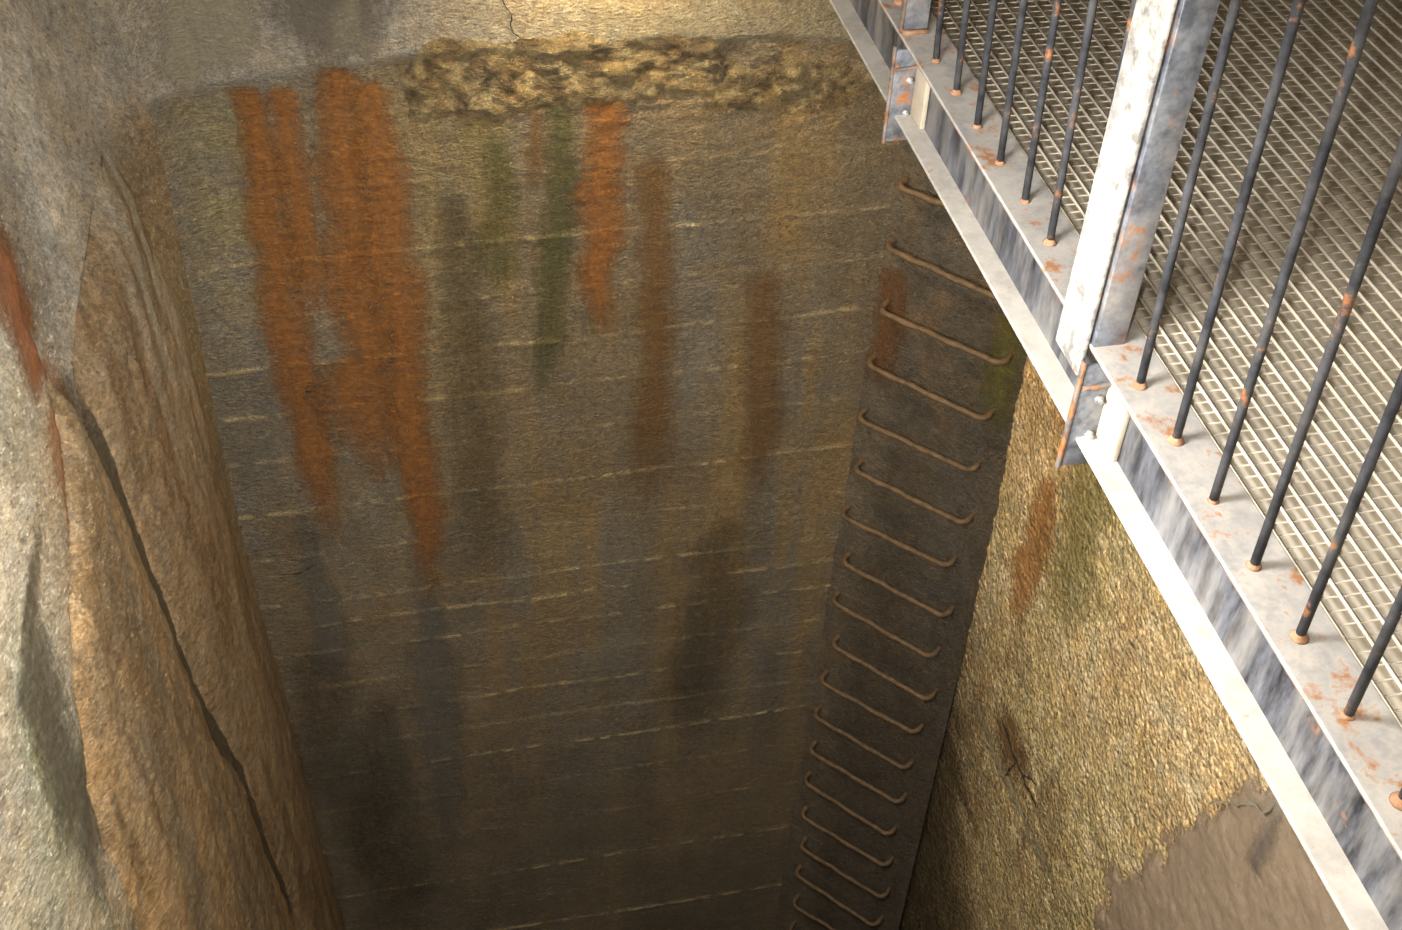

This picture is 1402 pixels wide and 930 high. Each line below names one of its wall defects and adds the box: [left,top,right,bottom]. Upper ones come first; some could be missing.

spalling [401,30,876,123]
rust [576,102,625,321]
rust [1014,480,1055,613]